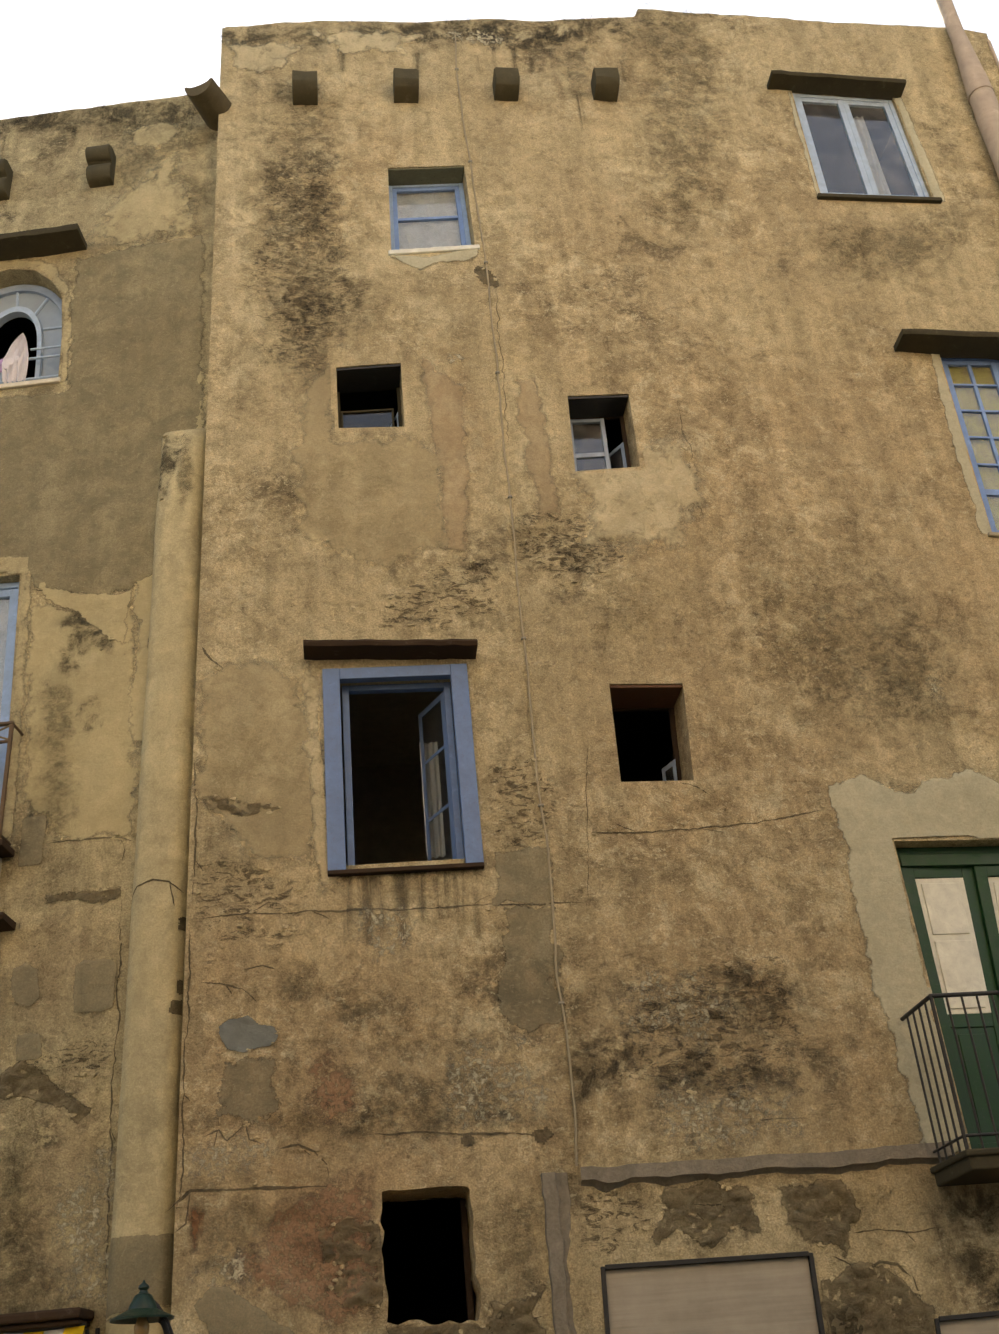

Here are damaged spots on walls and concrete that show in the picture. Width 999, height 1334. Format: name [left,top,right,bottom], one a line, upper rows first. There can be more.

water stain [255,111,342,379]
spalling [158,432,179,502]
flaking render [39,582,131,672]
crack [51,744,825,1296]
water stain [618,970,786,1044]
spalling [0,1045,110,1124]
water stain [574,1039,632,1097]
water stain [657,1071,797,1149]
spalling [584,1178,761,1261]
spalling [779,1178,935,1334]